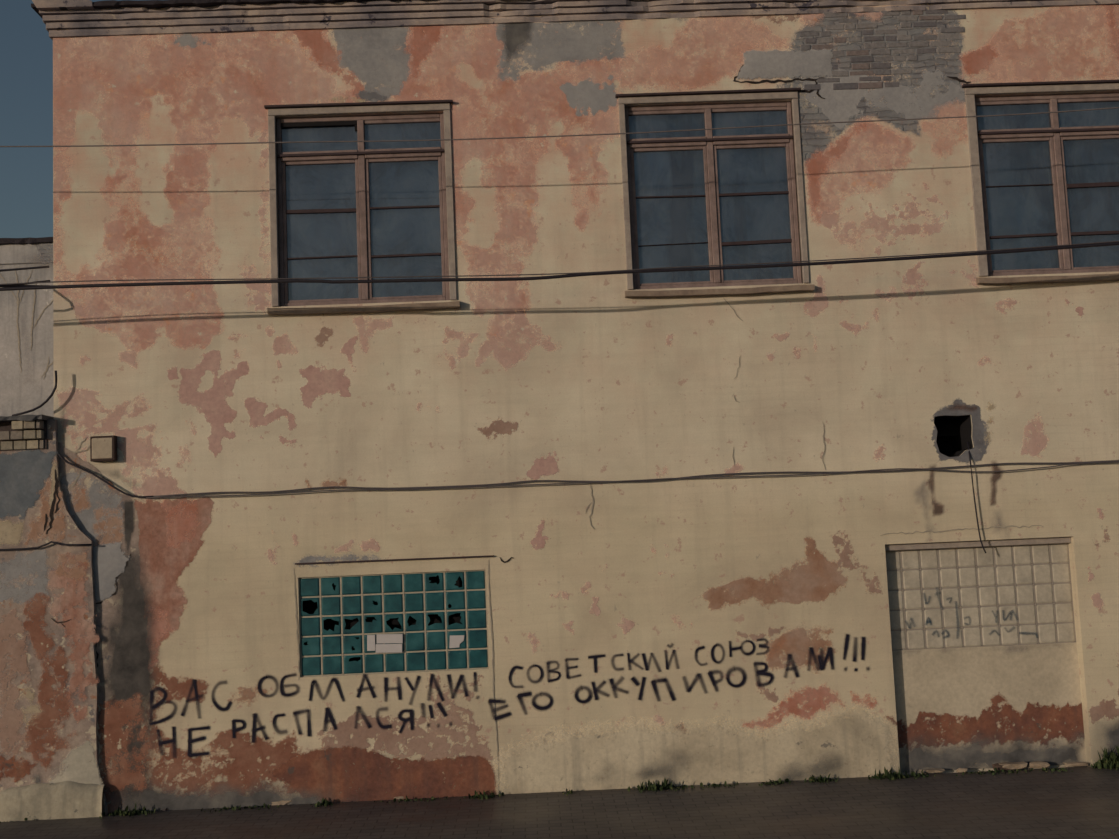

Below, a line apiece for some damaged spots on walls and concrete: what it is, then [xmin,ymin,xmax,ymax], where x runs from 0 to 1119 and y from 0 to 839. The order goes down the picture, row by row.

flaking render [752,4,1119,255]
peeling [36,20,626,457]
flaking render [932,400,994,463]
crack [44,437,90,534]
rust [928,467,943,515]
rust [991,465,1001,505]
peeling [0,388,497,813]
peeling [703,531,881,610]
leakage [107,502,322,812]
peeling [738,627,835,670]
peeling [887,690,1119,750]
leakage [1106,724,1119,758]